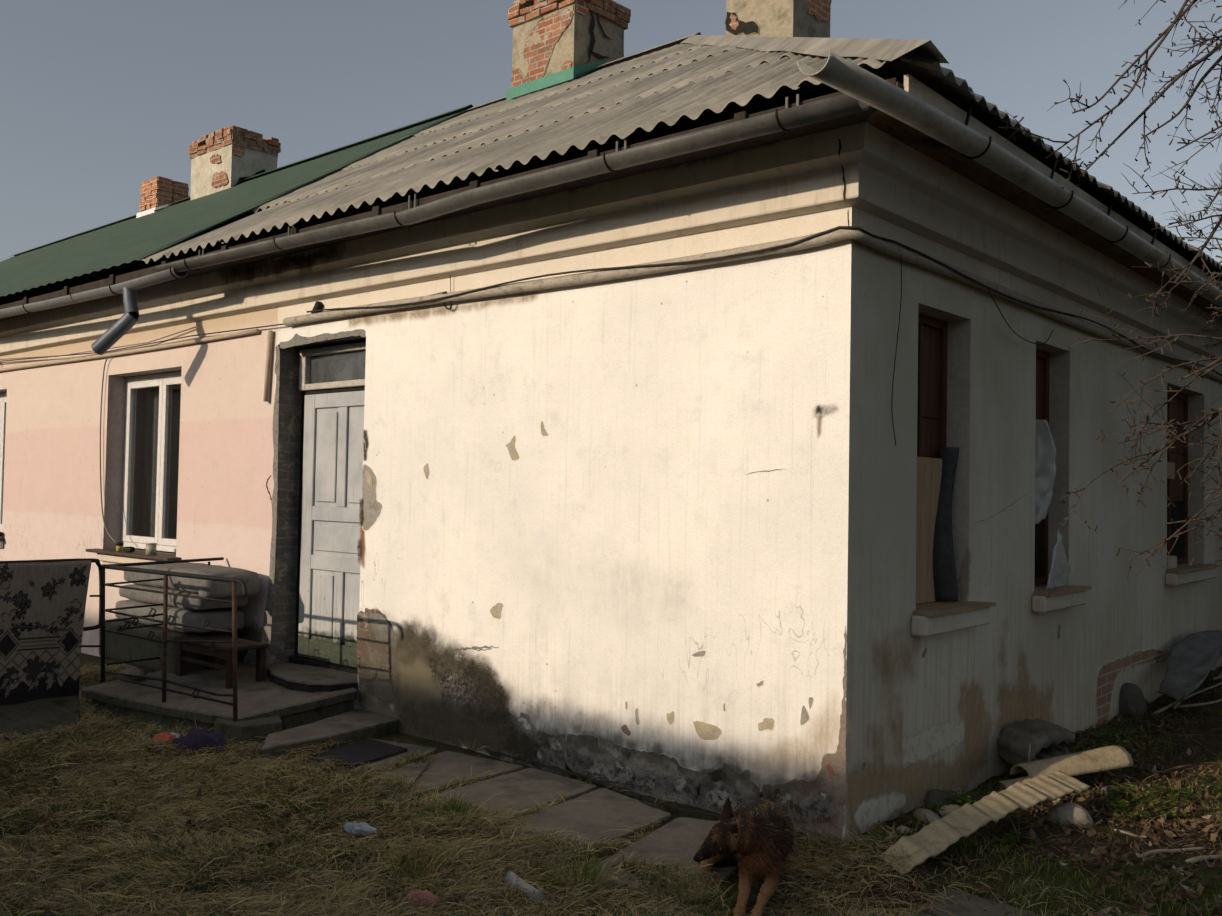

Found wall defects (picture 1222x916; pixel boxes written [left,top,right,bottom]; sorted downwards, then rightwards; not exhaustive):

flaking render [511,3,589,98]
crack [586,10,611,64]
crack [838,139,849,226]
peeling [505,435,520,462]
flaking render [362,463,384,532]
flaking render [356,606,395,688]
peeling [489,601,504,620]
leakage [357,623,831,824]
flaking render [501,626,906,843]
leakage [848,657,1052,833]